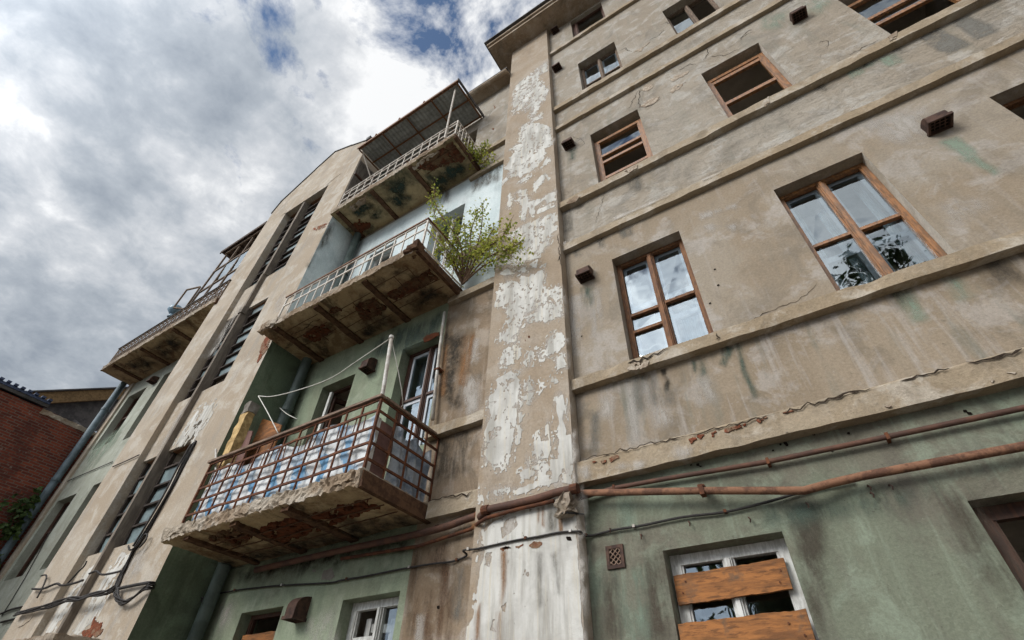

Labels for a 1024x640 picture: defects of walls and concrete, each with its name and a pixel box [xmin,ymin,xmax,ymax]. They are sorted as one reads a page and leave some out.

spalling [257,337,270,363]
leakage [441,336,477,412]
peeling [466,64,584,640]
crack [629,349,665,363]
crack [902,348,1022,381]
peeling [173,398,217,447]
crack [586,389,869,460]
spalling [689,416,767,444]
spalling [207,498,398,557]
peeling [44,552,130,638]